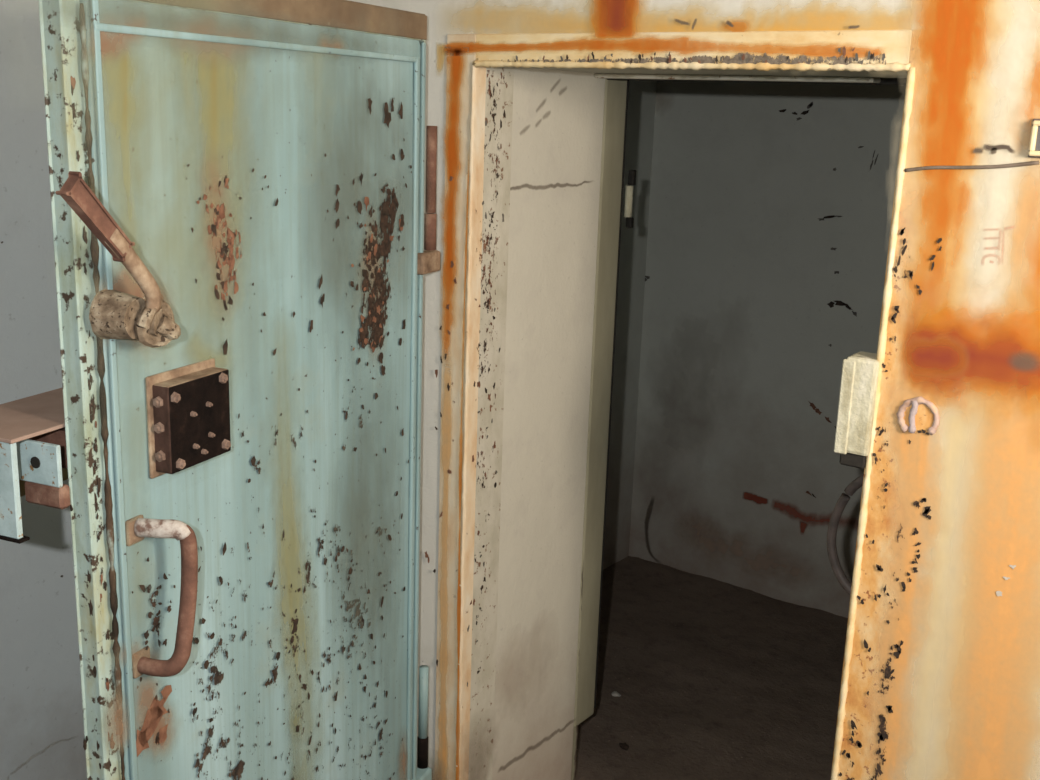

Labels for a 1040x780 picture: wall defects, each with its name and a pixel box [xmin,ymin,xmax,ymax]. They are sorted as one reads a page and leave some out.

corrosion [100,26,139,56]
corrosion [208,180,229,291]
corrosion [436,0,1040,780]